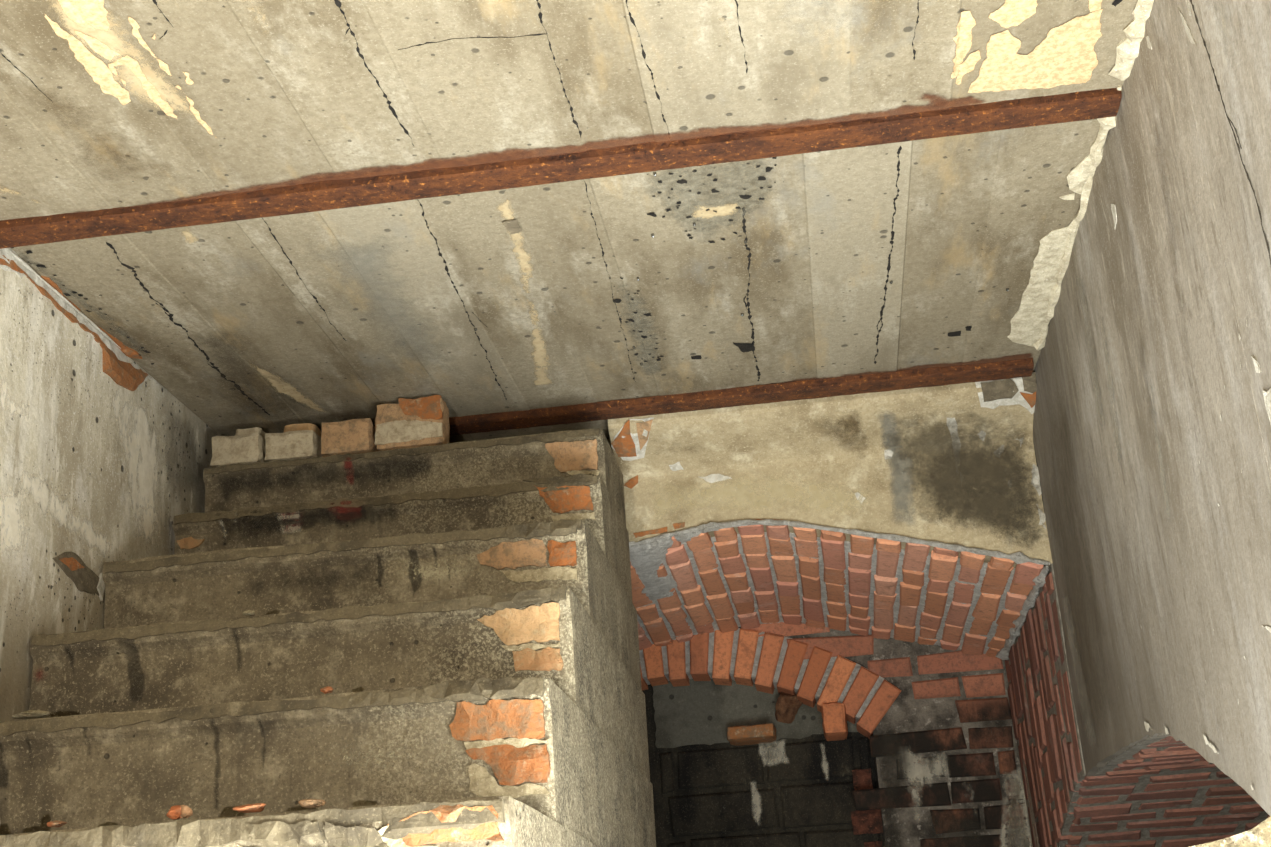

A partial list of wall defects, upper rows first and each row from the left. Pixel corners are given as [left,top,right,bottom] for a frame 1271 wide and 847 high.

spalling [45,0,216,137]
crack [334,0,414,146]
rust [127,94,983,208]
crack [626,0,670,134]
spalling [951,0,1103,93]
crack [1190,0,1271,265]
spalling [0,247,154,391]
crack [874,146,902,364]
rust [771,353,1031,384]
water stain [896,427,1035,539]
flaking render [477,602,564,672]
flaking render [449,699,551,786]